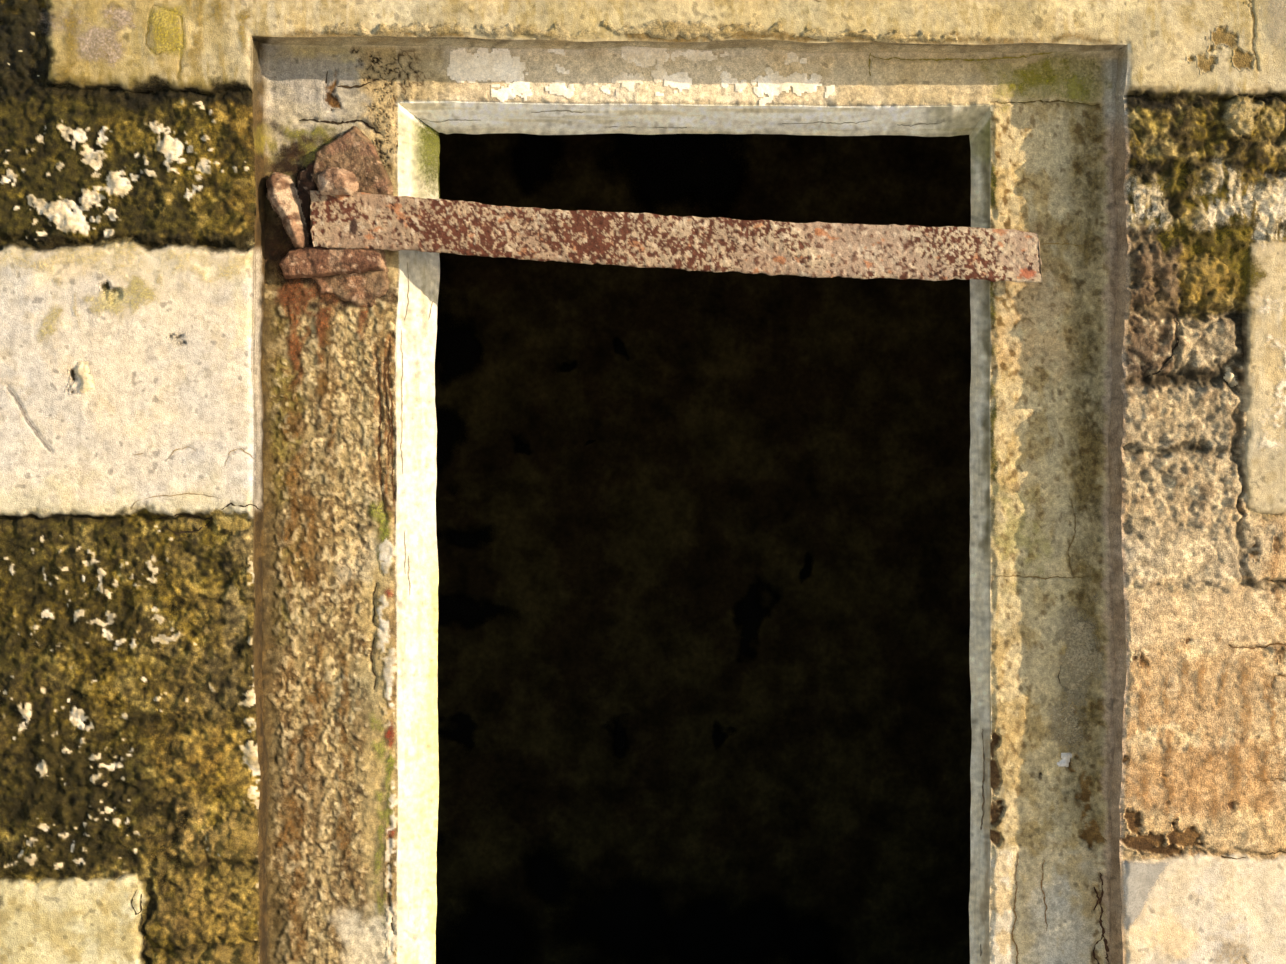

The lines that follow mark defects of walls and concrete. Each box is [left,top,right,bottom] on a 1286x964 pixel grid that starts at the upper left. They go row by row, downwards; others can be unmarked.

corrosion [265,123,340,190]
corrosion [264,206,398,379]
crack [1147,311,1179,377]
crack [1229,642,1286,686]
crack [1012,854,1048,964]
crack [1093,873,1109,964]